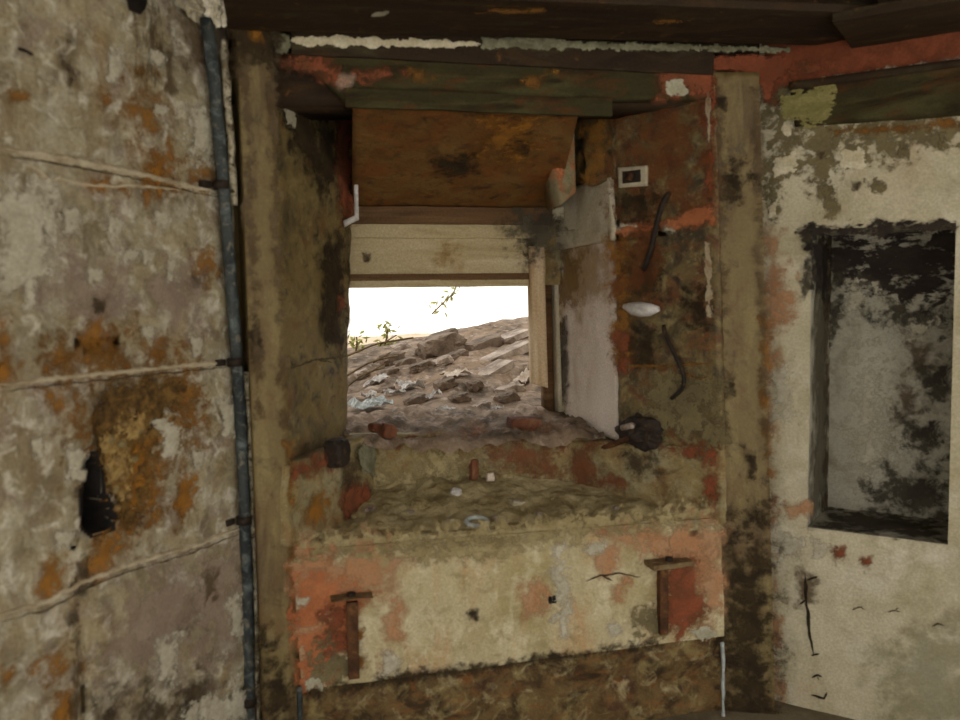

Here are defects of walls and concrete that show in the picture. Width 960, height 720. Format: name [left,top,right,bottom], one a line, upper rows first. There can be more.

flaking render [173,0,227,29]
peeling [153,99,215,169]
peeling [272,31,960,198]
leakage [760,86,960,221]
peeling [0,162,179,309]
leakage [316,232,351,360]
peeling [704,241,714,318]
leakage [799,230,816,298]
rust [0,312,211,583]
spalling [54,376,204,550]
peeling [284,506,727,701]
peeling [181,687,247,720]